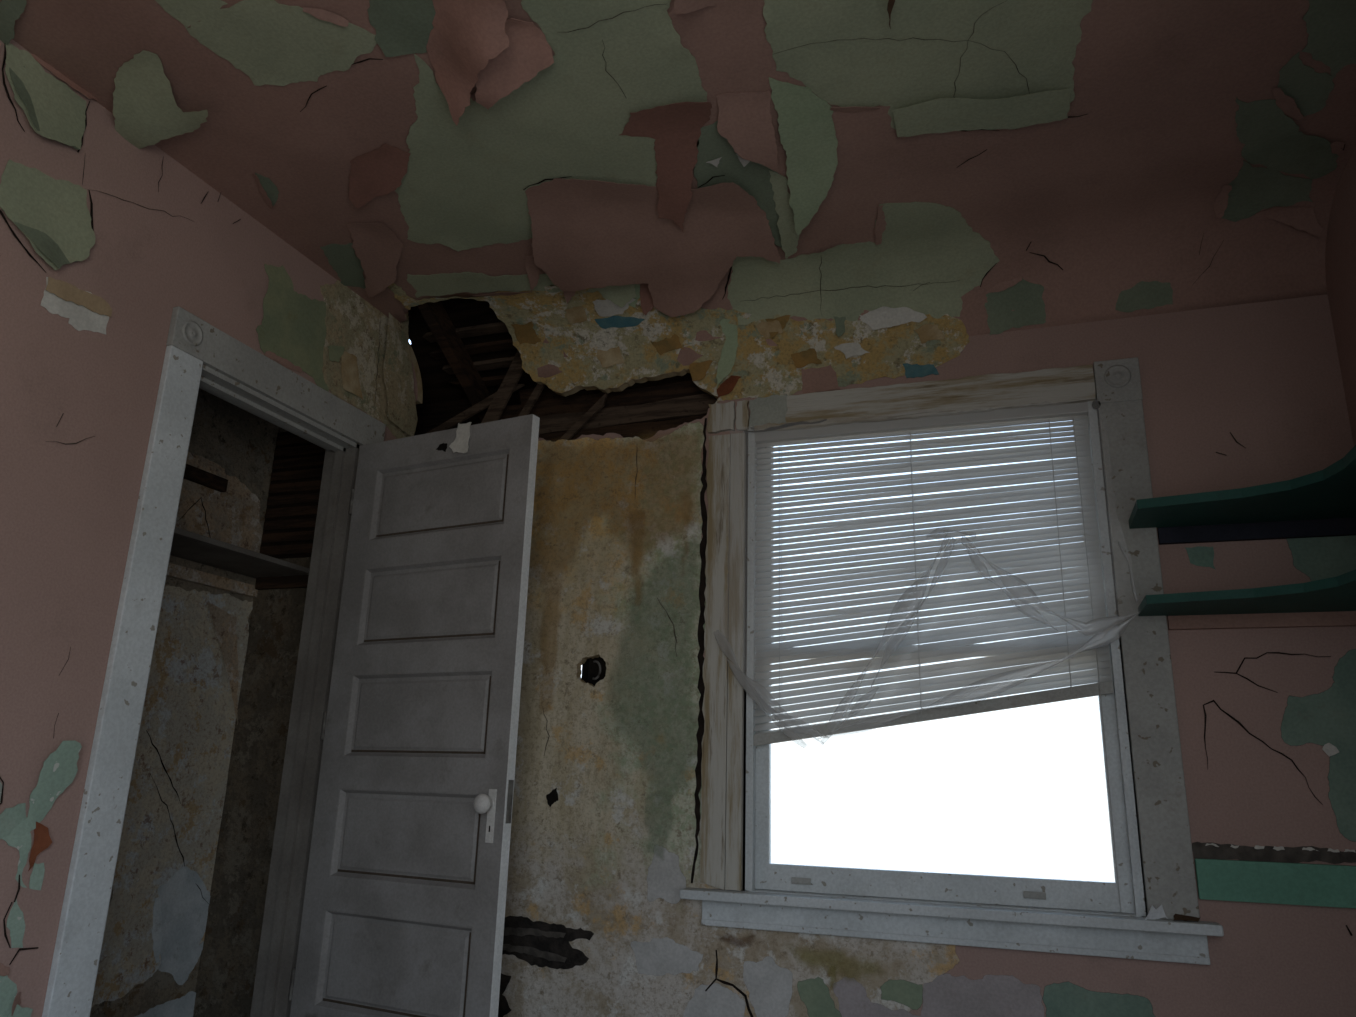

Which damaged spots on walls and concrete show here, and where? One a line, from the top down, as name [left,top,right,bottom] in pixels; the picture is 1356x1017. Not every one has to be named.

peeling [0,0,208,150]
peeling [0,159,112,334]
peeling [155,0,1093,439]
flaking render [498,422,1155,1017]
crack [1203,652,1331,805]
peeling [1281,649,1356,842]
peeling [0,740,82,948]
peeling [0,963,33,1017]